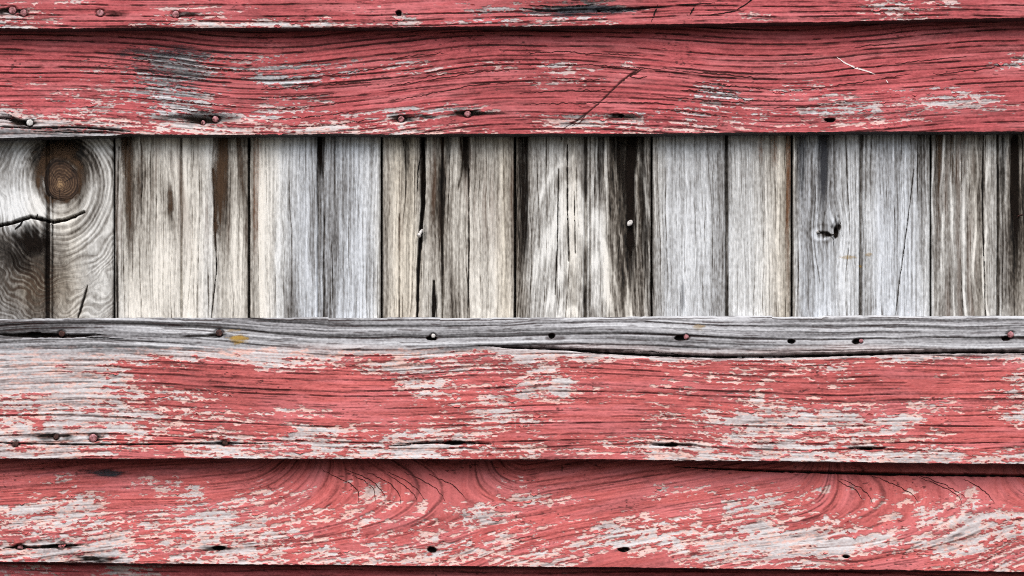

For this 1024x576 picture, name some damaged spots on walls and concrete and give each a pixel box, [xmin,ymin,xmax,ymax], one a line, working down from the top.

crack [133,43,1015,318]
crack [0,213,84,235]
peeling [0,338,226,449]
peeling [395,372,592,427]
peeling [176,423,495,459]
crack [322,469,463,503]
peeling [633,402,915,460]
crack [658,444,1024,504]
peeling [736,444,1020,463]
peeling [0,473,151,576]
peeling [528,493,883,562]
peeling [896,498,1024,559]